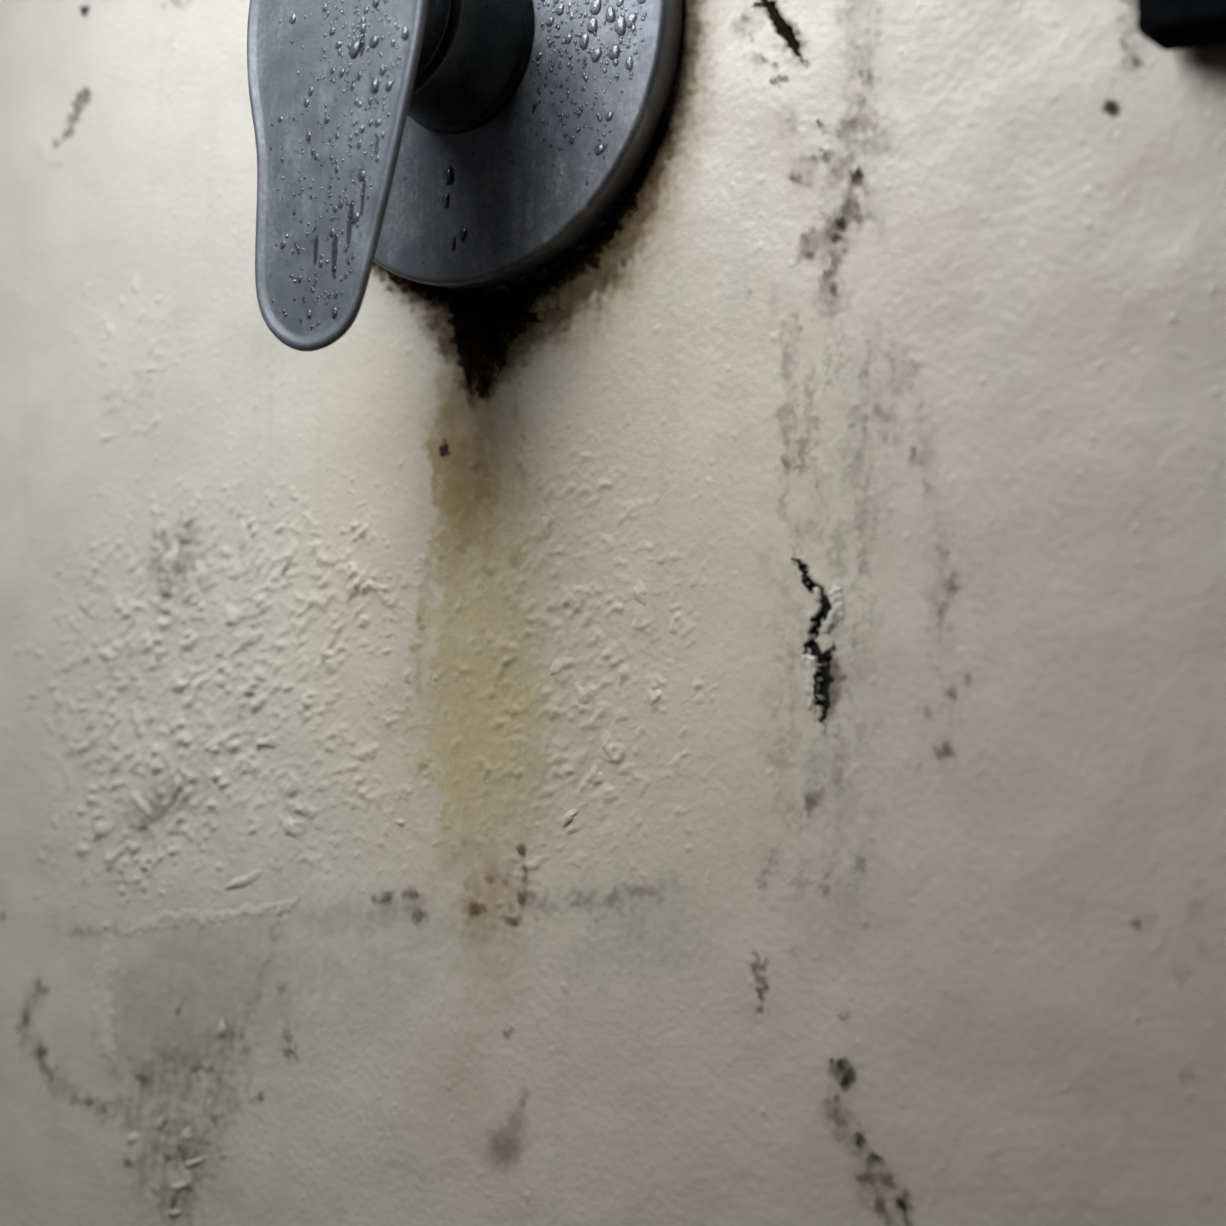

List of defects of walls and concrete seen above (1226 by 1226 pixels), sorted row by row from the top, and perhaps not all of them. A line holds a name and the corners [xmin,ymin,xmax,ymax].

crack [753,0,808,67]
mould [372,0,698,407]
mould [823,199,858,275]
mould [850,168,861,184]
crack [791,558,845,733]
mould [830,1058,853,1086]
mould [855,1132,912,1226]